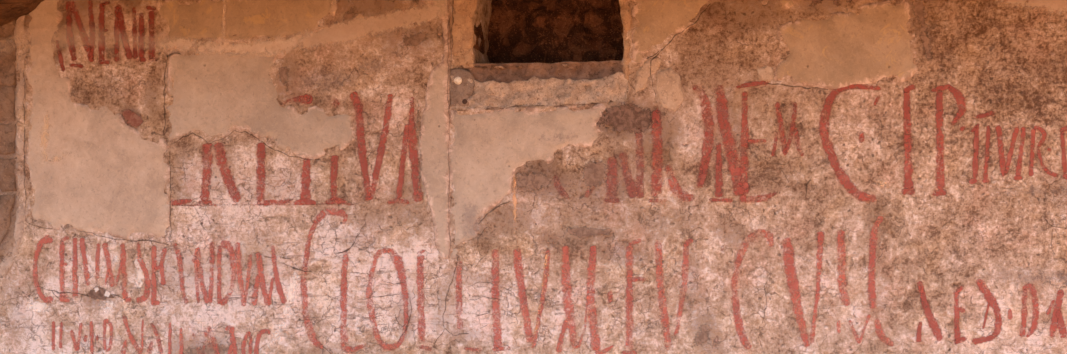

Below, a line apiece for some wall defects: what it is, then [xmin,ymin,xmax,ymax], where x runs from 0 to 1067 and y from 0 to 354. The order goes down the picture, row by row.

flaking render [122,108,144,127]
crack [90,52,309,245]
flaking render [596,103,666,133]
crack [353,281,412,342]